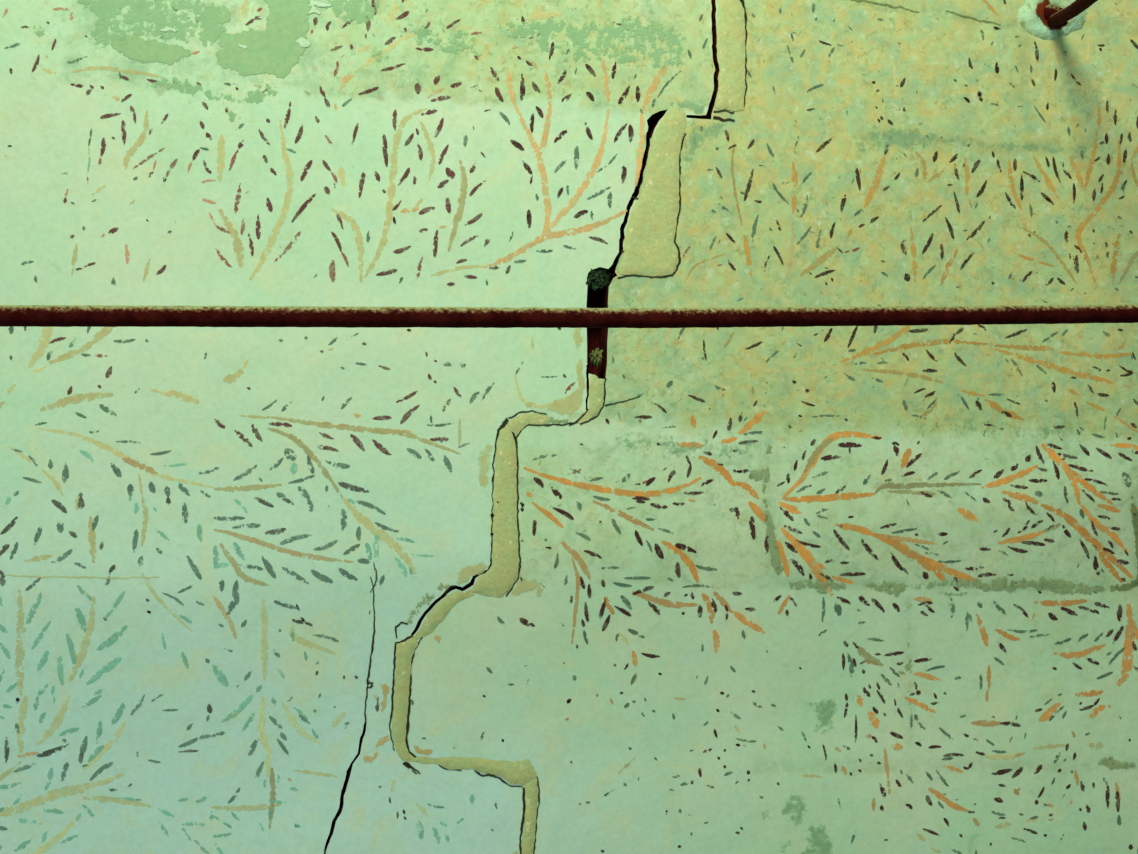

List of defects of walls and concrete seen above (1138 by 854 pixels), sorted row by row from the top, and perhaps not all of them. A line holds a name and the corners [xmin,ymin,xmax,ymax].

crack [851,0,919,13]
crack [946,10,1001,26]
rust [1036,0,1068,30]
flaking render [414,25,492,57]
flaking render [506,15,686,68]
flaking render [77,0,379,122]
crack [324,0,748,854]